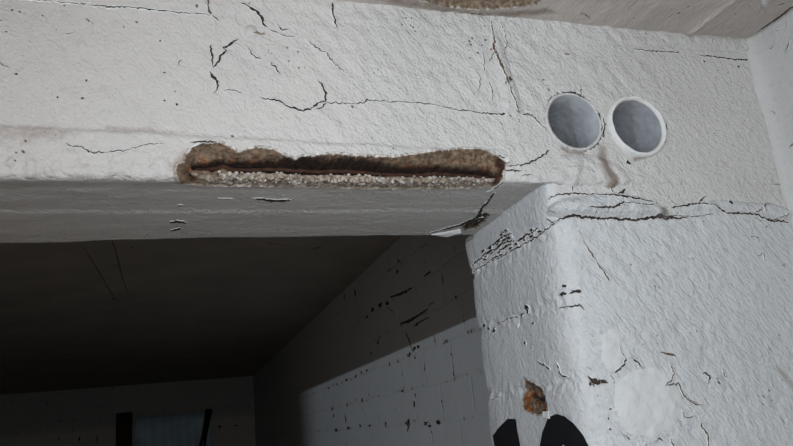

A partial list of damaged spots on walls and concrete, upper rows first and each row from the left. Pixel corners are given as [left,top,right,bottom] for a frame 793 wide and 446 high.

crack [22,0,219,22]
spalling [415,0,543,18]
crack [240,2,348,75]
crack [64,142,164,155]
crack [190,138,217,146]
spalling [172,139,510,190]
crack [209,19,549,233]
crack [545,186,789,262]
crack [583,240,611,283]
crack [615,344,643,373]
crack [660,351,727,446]
crack [607,408,675,446]